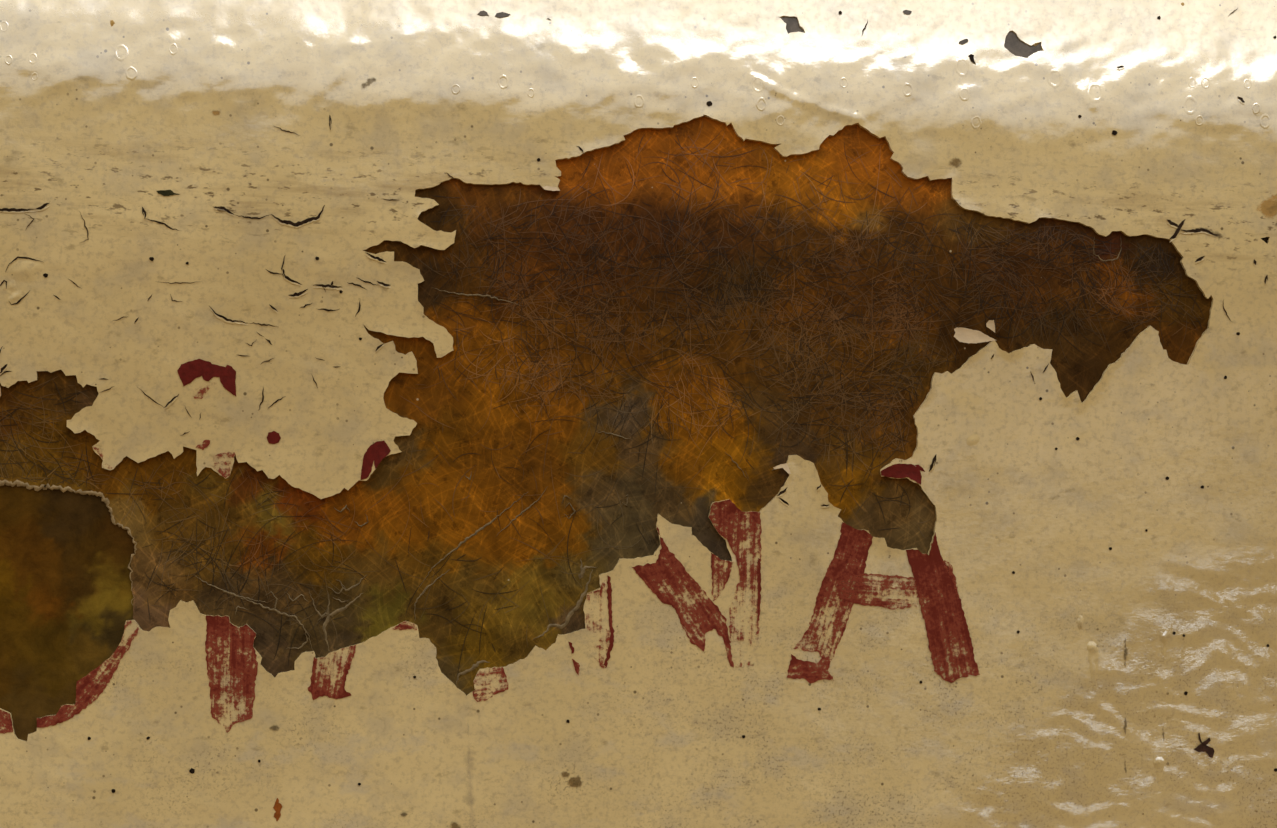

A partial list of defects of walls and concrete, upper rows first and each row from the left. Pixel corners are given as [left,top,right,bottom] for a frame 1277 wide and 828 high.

peeling [781,17,805,34]
peeling [1004,31,1042,58]
peeling [0,116,1212,741]